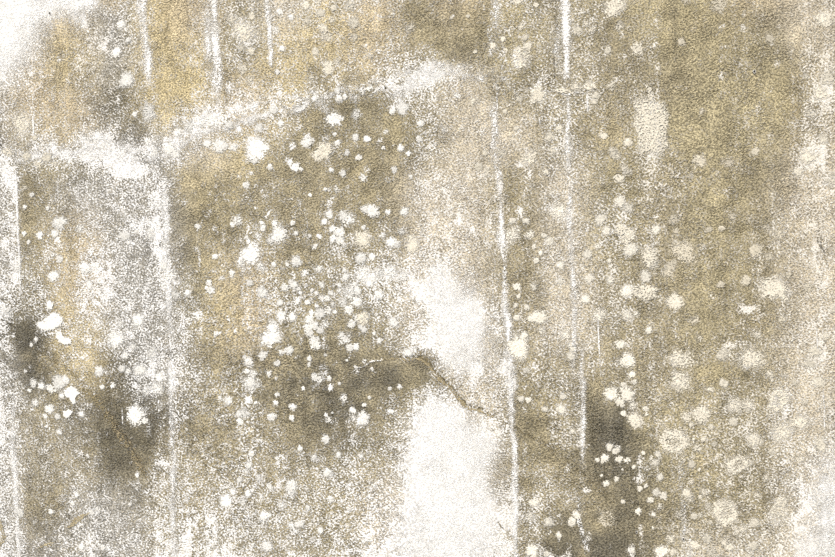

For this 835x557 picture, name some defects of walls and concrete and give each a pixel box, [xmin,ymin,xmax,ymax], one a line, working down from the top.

crack [351,348,618,505]